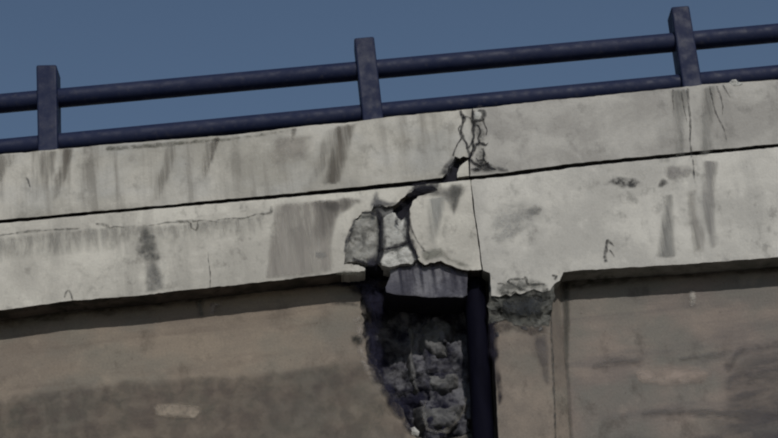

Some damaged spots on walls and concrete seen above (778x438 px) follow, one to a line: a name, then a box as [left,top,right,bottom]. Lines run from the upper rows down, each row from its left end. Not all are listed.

water stain [328,125,351,183]
crack [448,105,496,179]
water stain [705,161,714,231]
water stain [140,230,160,288]
water stain [268,198,353,277]
water stain [660,209,673,256]
spalling [342,183,472,438]